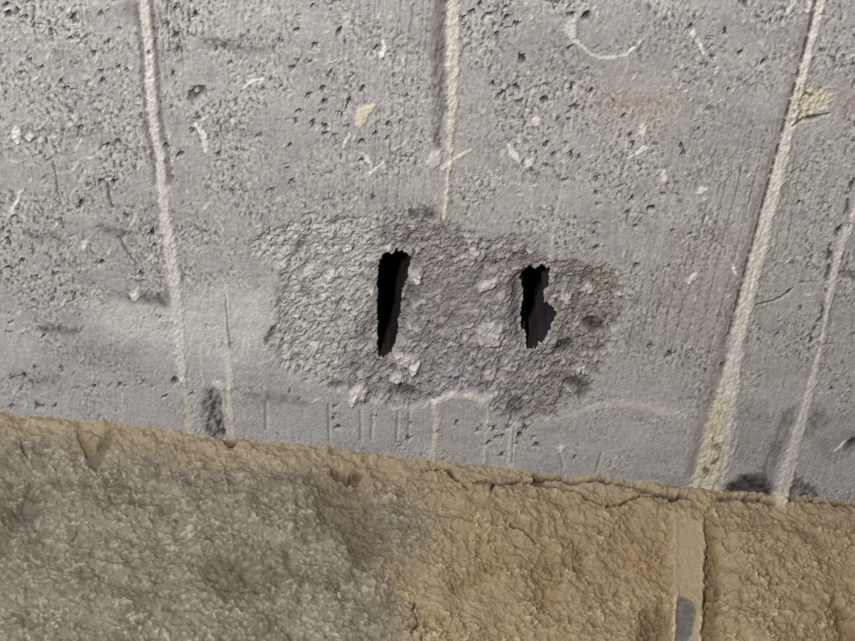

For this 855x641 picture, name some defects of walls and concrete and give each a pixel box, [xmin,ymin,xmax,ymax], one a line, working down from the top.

spalling [251,212,627,448]
crack [426,466,692,508]
crack [716,494,855,507]
crack [509,520,538,545]